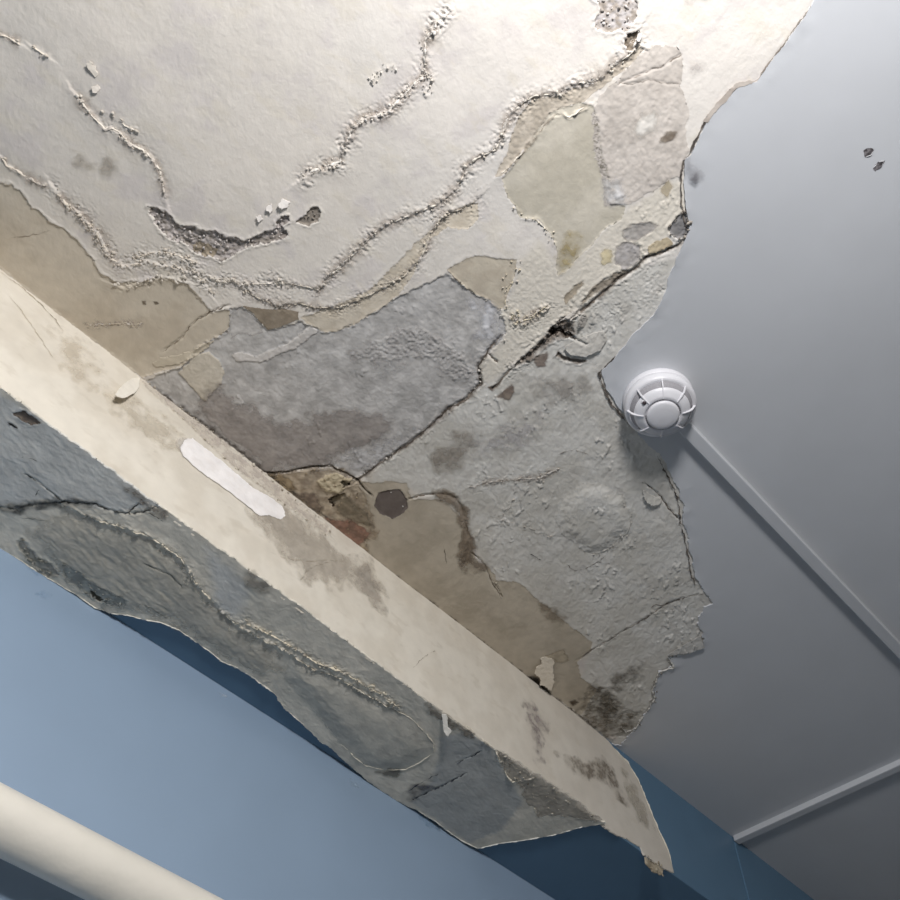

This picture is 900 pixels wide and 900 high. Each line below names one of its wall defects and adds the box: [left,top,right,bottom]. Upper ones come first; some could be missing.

crack [270,122,707,494]
crack [0,458,162,521]
peeling [0,386,606,849]
leakage [570,669,634,737]
crack [583,456,700,657]